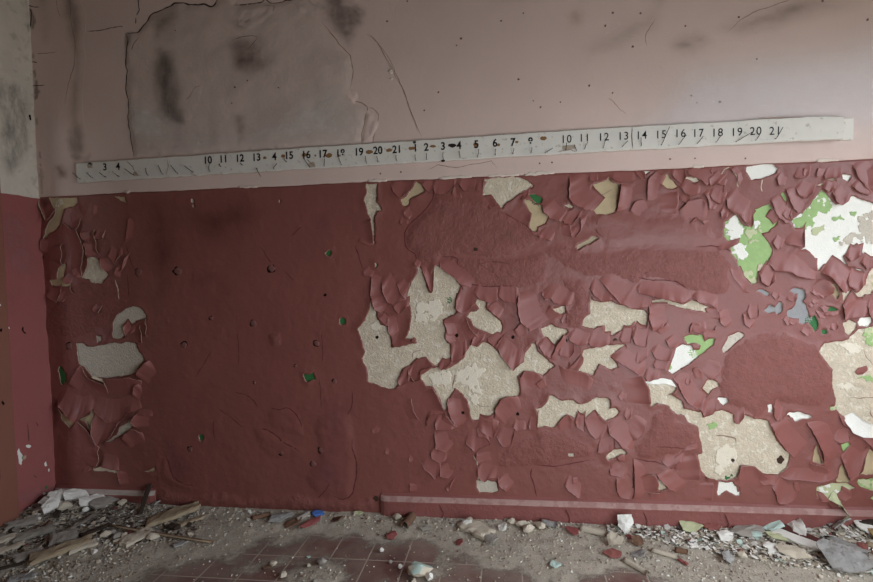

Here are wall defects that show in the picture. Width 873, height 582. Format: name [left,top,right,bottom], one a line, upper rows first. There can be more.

crack [56,0,316,176]
crack [324,25,379,144]
crack [366,34,419,130]
peeling [38,197,134,303]
peeling [58,306,156,486]
peeling [358,157,873,546]